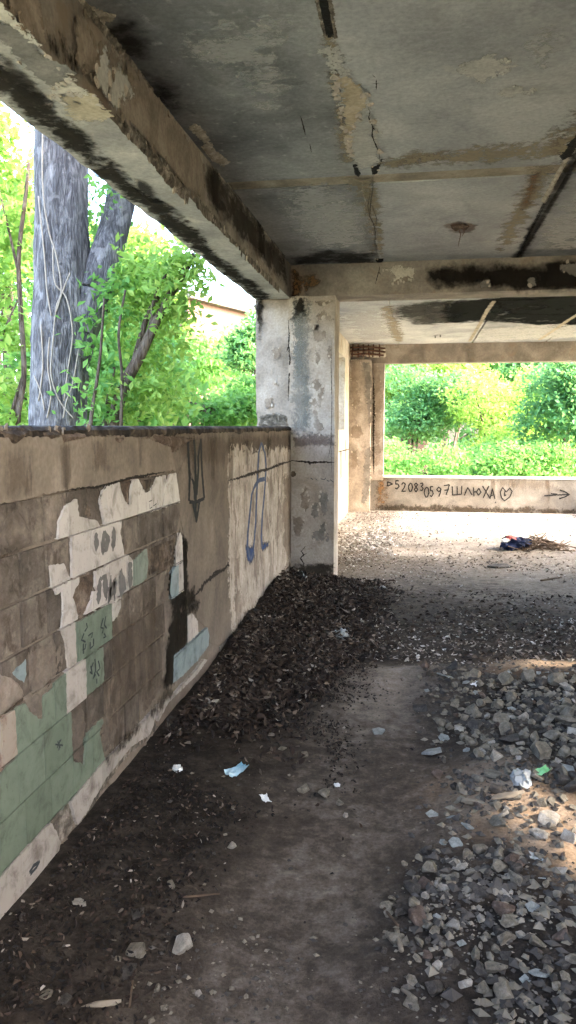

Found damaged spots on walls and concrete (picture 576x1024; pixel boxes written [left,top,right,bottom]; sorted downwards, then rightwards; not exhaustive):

water stain [4,59,50,102]
peeling [0,0,279,293]
water stain [184,19,288,110]
peeling [315,0,384,177]
crack [367,76,381,284]
water stain [478,200,576,342]
crack [228,351,376,481]
water stain [292,269,320,435]
spalling [73,571,94,618]
spalling [121,475,153,503]
spalling [146,531,176,581]
water stain [151,539,188,718]